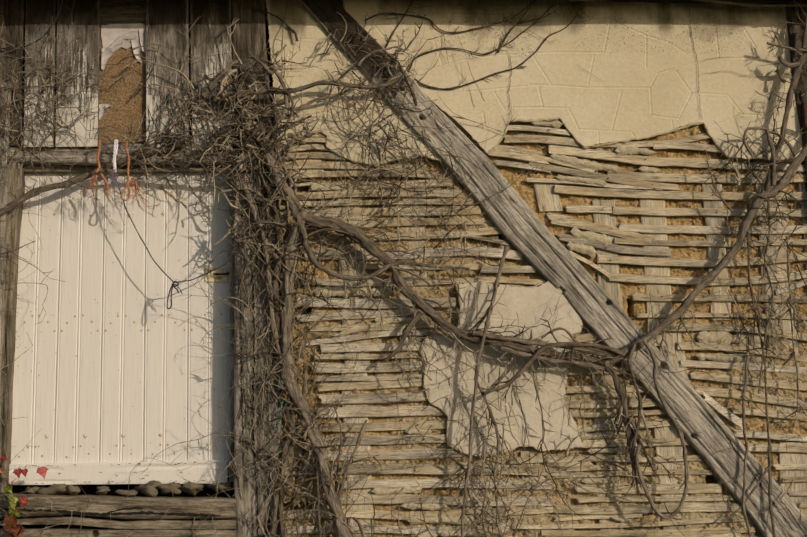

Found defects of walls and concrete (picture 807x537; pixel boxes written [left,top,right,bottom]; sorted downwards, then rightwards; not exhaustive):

flaking render [487,117,793,187]
flaking render [567,227,611,258]
flaking render [696,331,750,363]
flaking render [405,282,636,469]
flaking render [512,476,546,486]
flaking render [371,484,506,537]